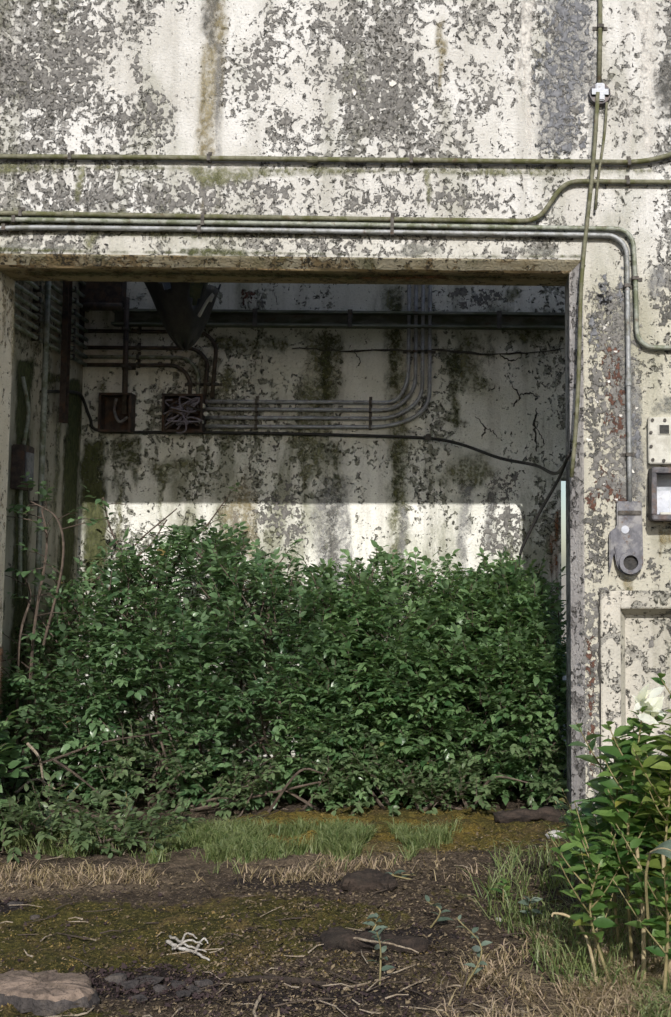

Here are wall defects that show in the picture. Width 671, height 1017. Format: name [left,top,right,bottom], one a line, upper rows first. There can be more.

peeling [0,0,178,151]
damp [197,0,226,155]
peeling [238,2,450,141]
peeling [529,0,604,159]
peeling [45,172,305,214]
peeling [333,183,534,215]
crack [292,347,564,451]
damp [443,350,466,427]
damp [314,445,349,590]
damp [394,444,407,560]
damp [458,485,472,571]
peeling [576,267,671,803]